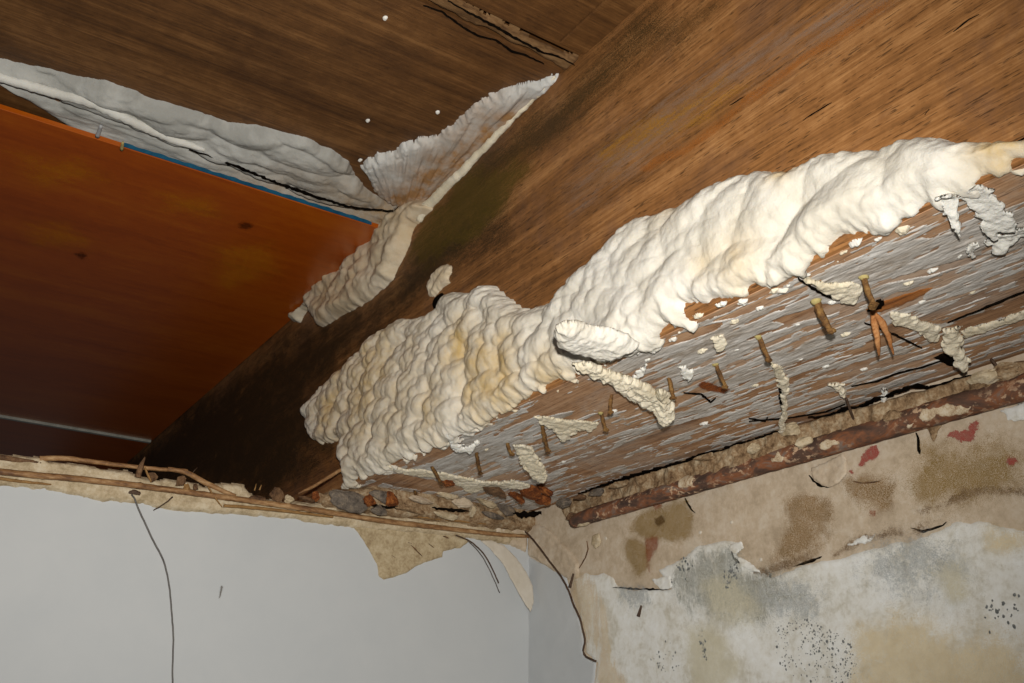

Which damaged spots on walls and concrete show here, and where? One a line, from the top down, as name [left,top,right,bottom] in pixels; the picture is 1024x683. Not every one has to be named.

corrosion [697,381,729,394]
crack [578,322,971,494]
flaking render [0,454,579,612]
leakage [572,429,1024,683]